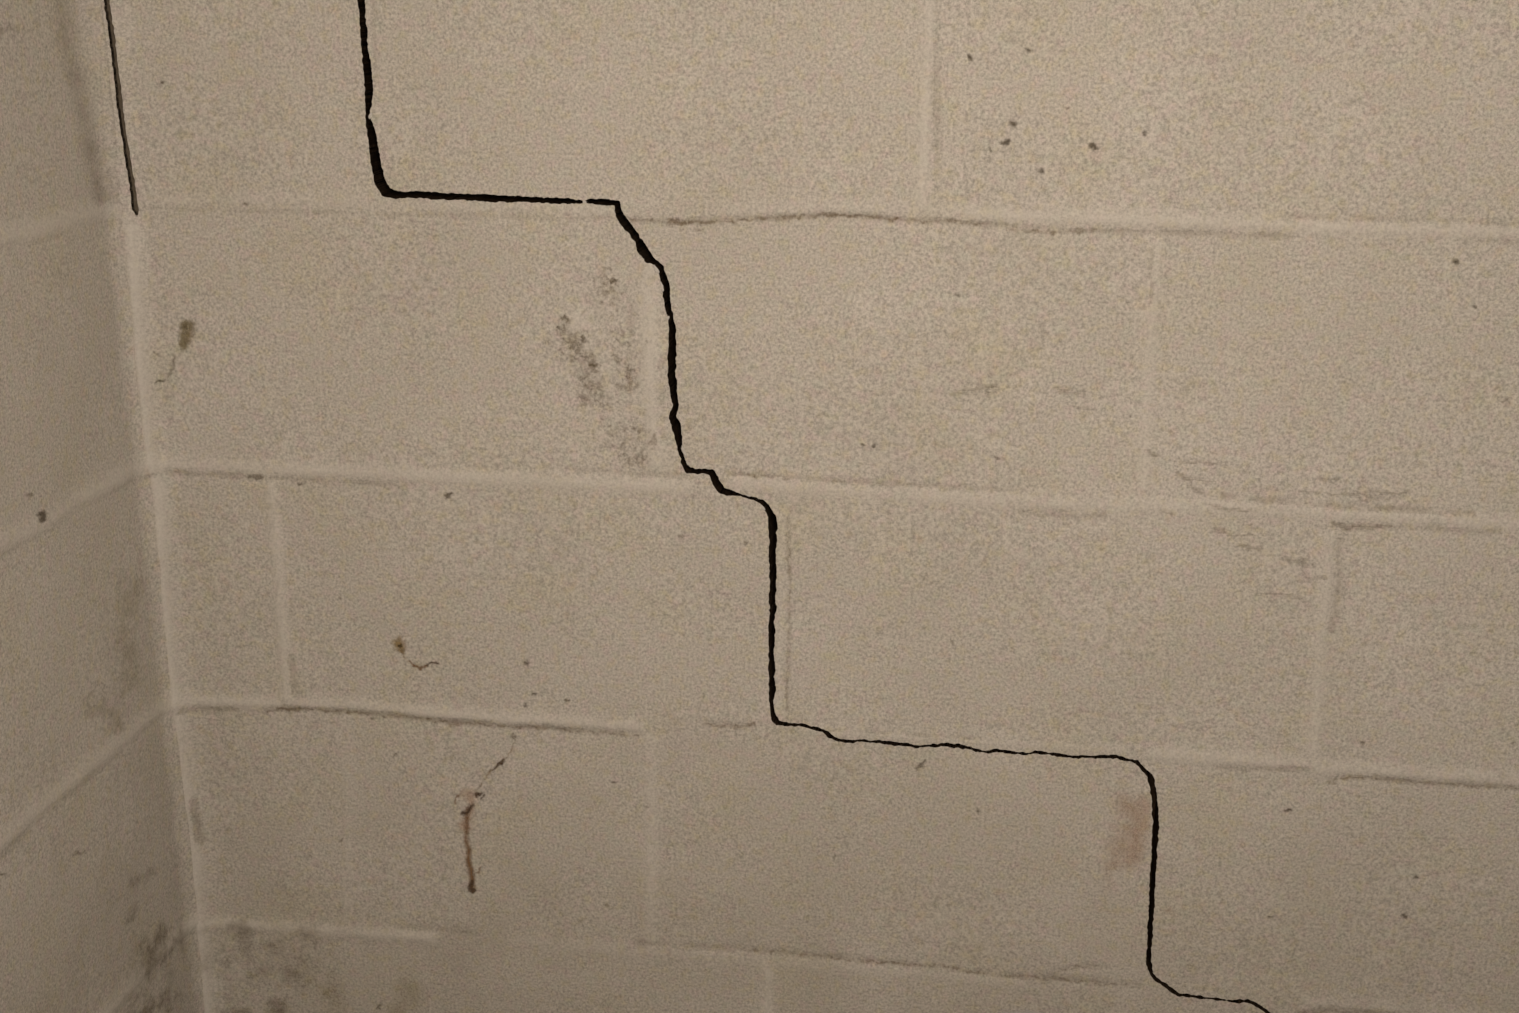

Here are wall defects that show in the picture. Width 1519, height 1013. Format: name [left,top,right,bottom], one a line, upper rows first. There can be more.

rust [455,792,484,893]
crack [357,0,1270,1013]